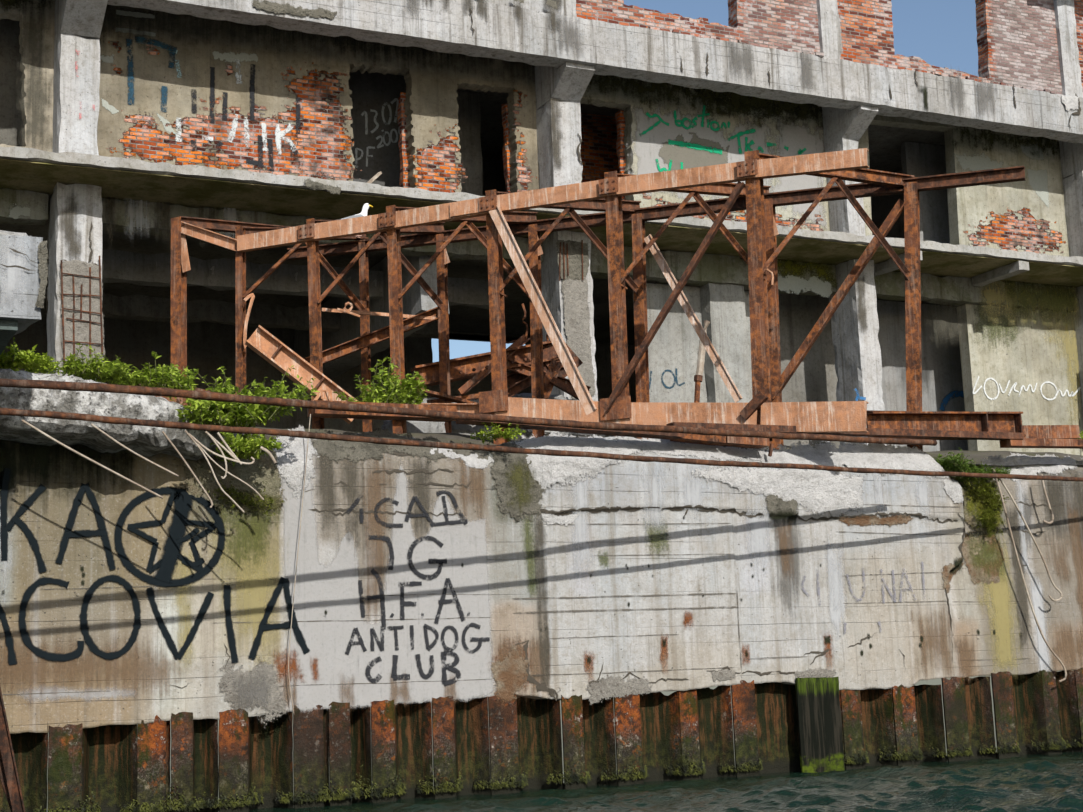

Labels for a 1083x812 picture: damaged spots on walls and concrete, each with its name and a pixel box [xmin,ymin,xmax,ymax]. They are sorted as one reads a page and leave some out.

peeling [101,62,362,194]
peeling [410,124,468,193]
peeling [963,144,1066,254]
leakage [2,253,24,297]
leakage [496,518,550,687]
spalling [91,424,1083,683]
crack [522,505,764,526]
crack [798,512,965,660]
leakage [984,475,1083,670]
leakage [0,646,168,701]
spalling [219,657,289,728]
corrosion [274,651,318,704]